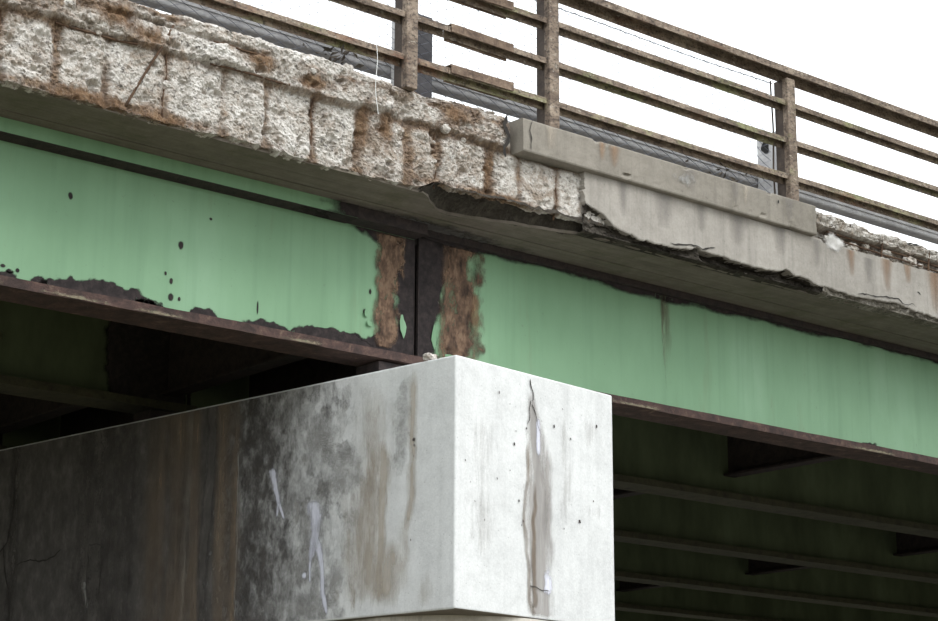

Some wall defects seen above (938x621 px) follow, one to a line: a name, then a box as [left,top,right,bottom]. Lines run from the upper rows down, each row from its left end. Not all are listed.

spalling [0,0,938,329]
rust [243,201,833,359]
crack [672,242,715,250]
crack [860,293,913,305]
leakage [0,386,341,621]
leakage [523,400,552,616]